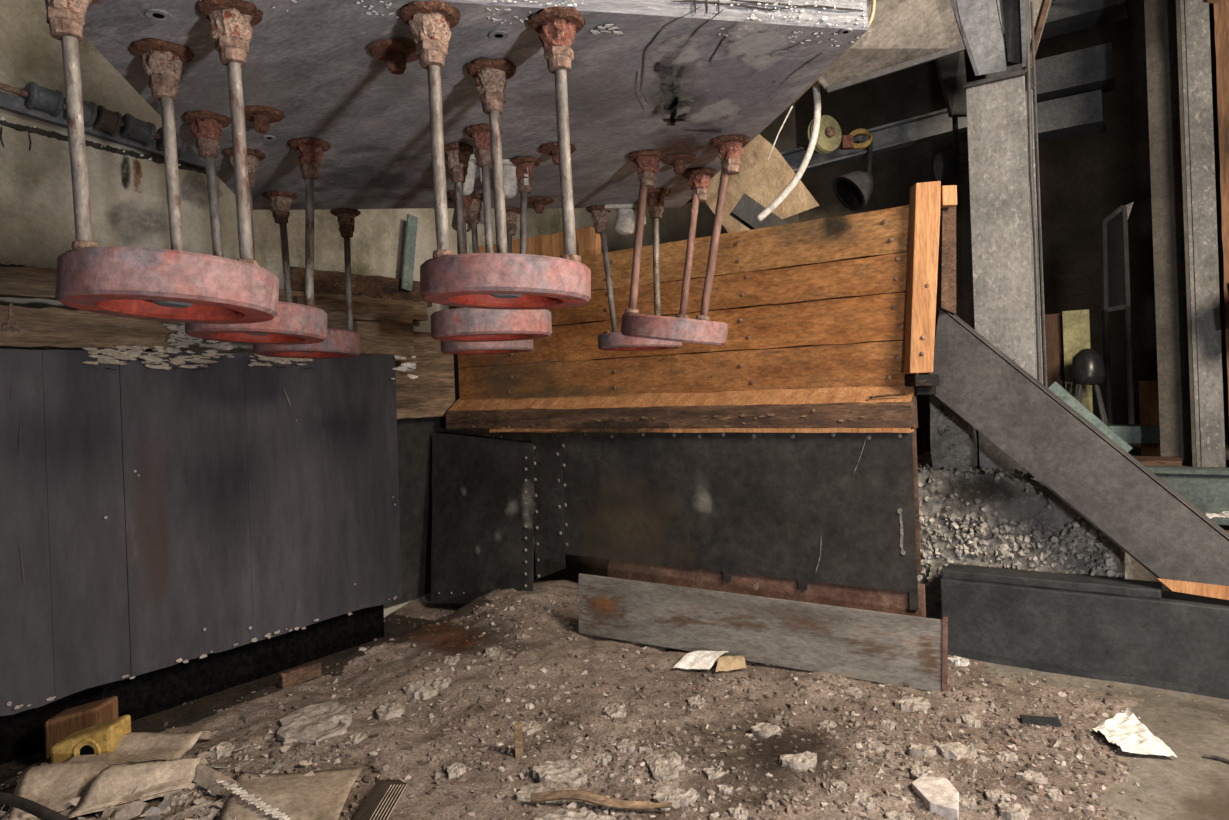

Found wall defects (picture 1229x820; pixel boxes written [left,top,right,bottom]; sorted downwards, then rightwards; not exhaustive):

damp [635,7,822,125]